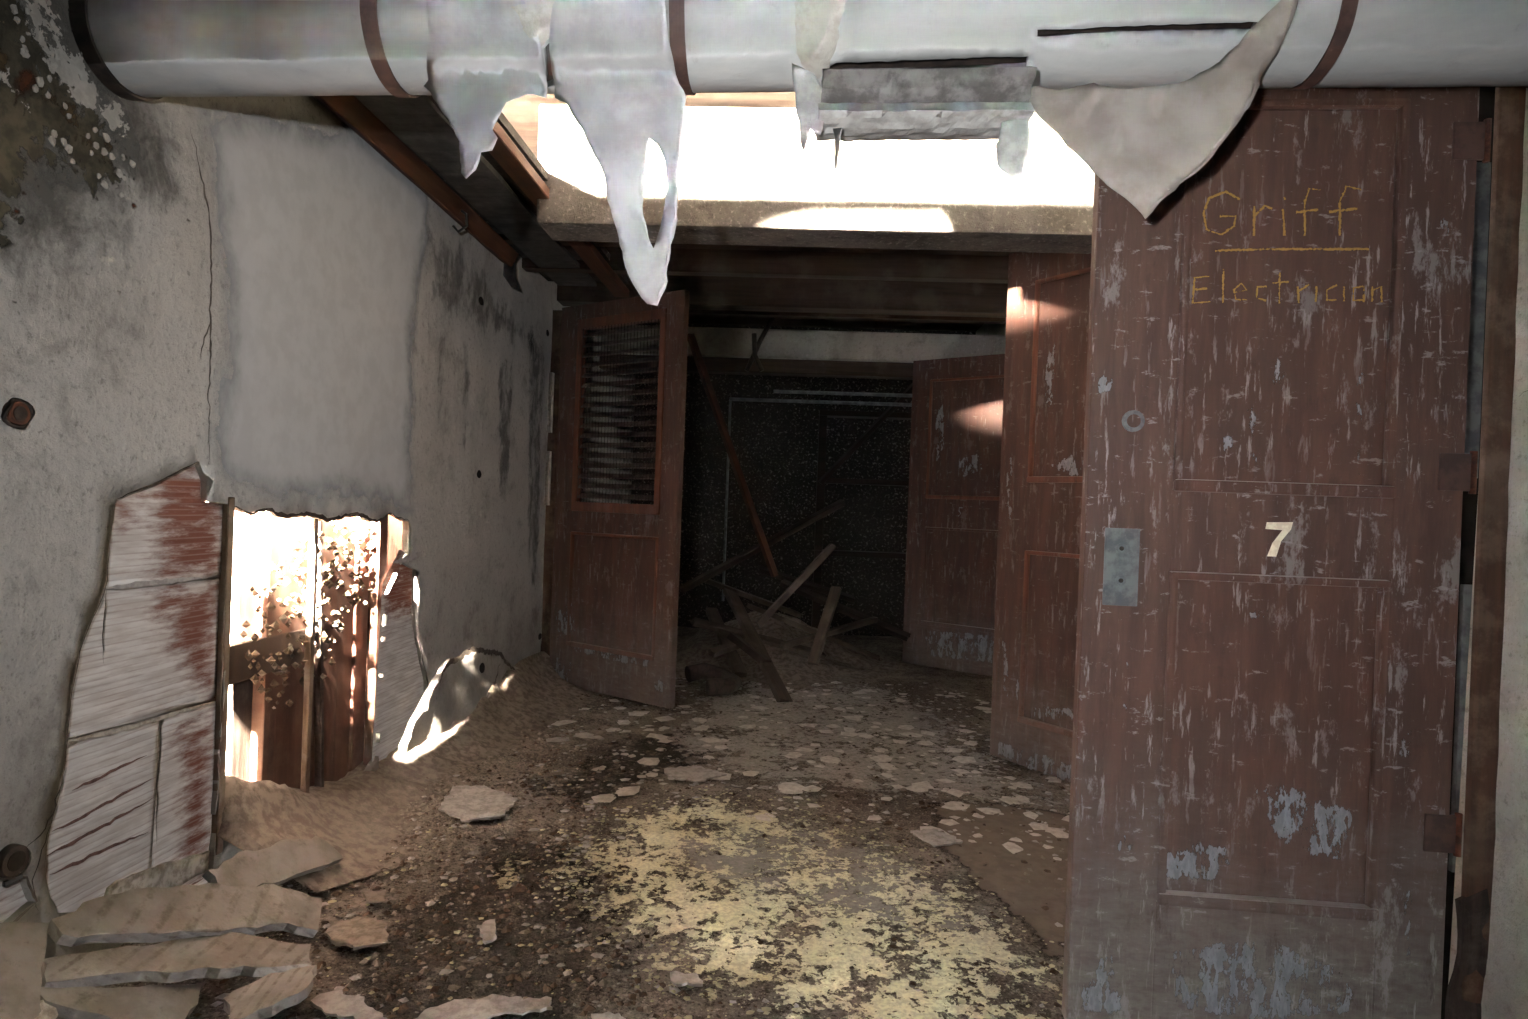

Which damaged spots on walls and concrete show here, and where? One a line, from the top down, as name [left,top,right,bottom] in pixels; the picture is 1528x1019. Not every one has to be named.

spalling [0,461,429,923]
peeling [324,843,457,922]
peeling [405,785,1064,1019]